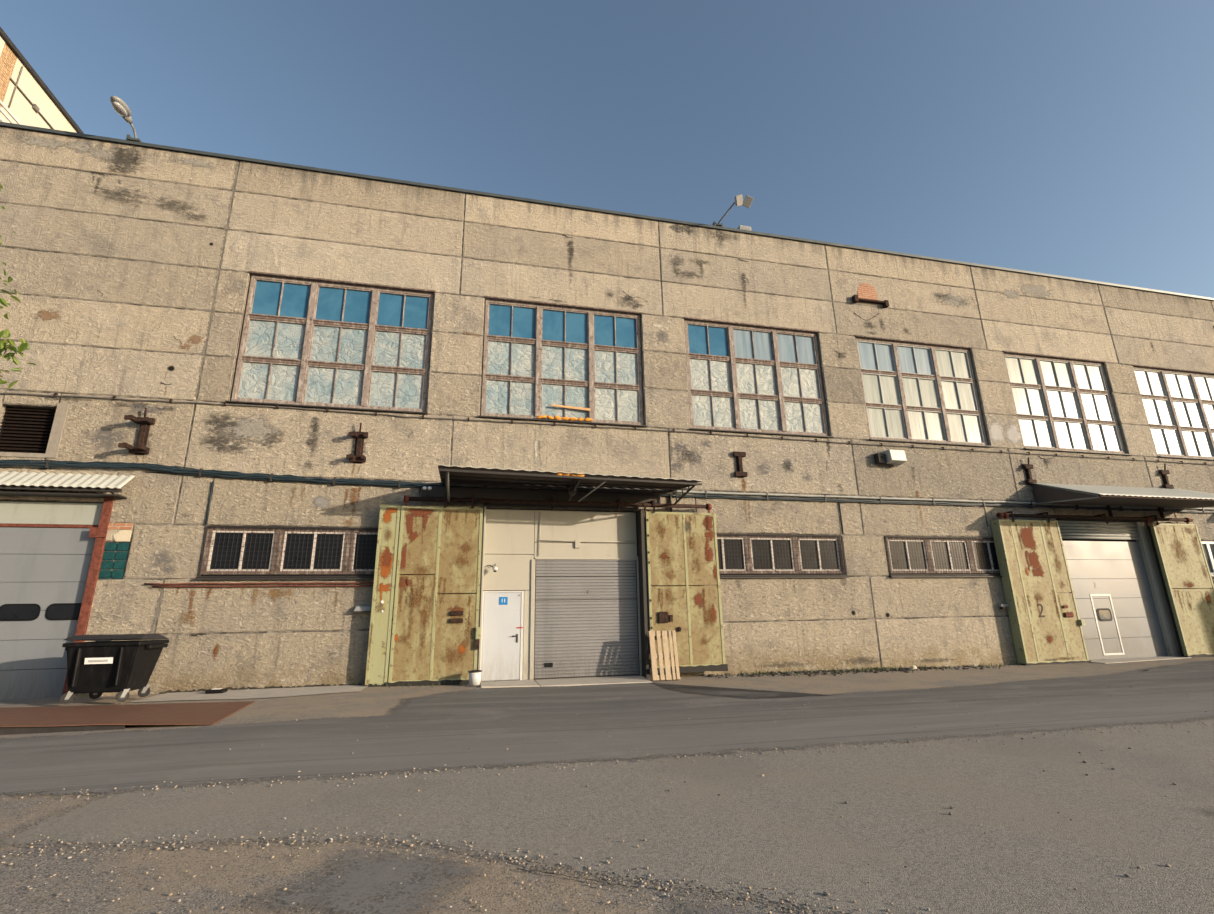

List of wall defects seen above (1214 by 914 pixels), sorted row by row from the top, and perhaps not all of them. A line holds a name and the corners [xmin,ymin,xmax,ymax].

damp [99,188,140,202]
damp [160,199,204,221]
damp [205,415,282,469]
rust [378,508,478,662]
rust [651,552,717,623]
rust [658,515,717,578]
rust [1008,524,1065,618]